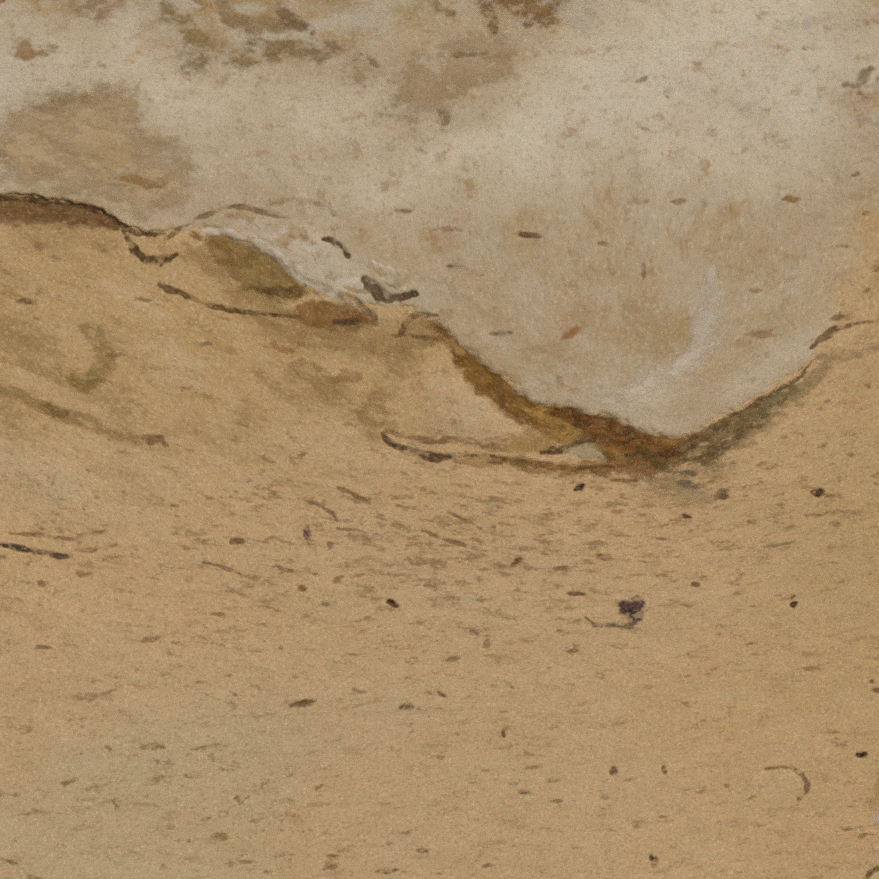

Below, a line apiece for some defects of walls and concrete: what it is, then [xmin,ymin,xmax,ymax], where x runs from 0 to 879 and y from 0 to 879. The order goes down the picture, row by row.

leakage [161,2,212,69]
leakage [221,0,341,67]
leakage [395,34,515,125]
crack [0,194,293,318]
flaking render [0,0,879,451]
efflorescence [601,266,724,403]
flaking render [566,438,608,463]
leakage [649,354,836,493]